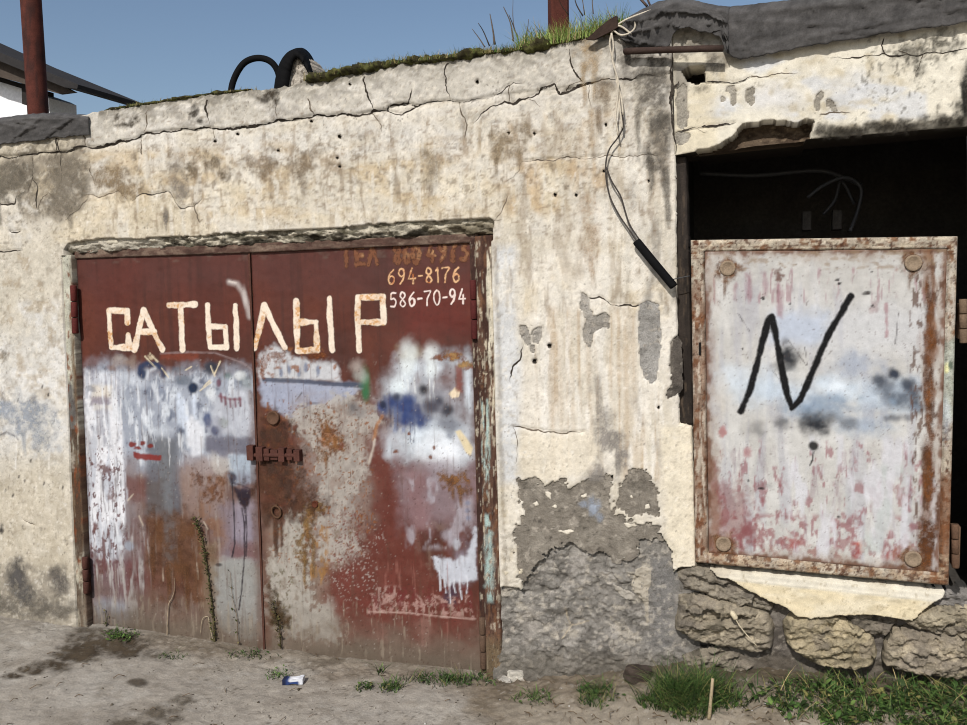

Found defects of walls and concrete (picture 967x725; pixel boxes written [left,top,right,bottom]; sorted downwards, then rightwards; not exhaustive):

crack [705,72,795,83]
crack [827,39,966,76]
damp [935,66,967,127]
crack [0,49,736,223]
damp [816,121,913,138]
damp [94,168,134,199]
peeling [580,293,610,347]
peeling [638,301,683,399]
rust [922,281,936,503]
rust [243,413,327,582]
rust [900,518,938,570]
spalling [492,468,700,682]